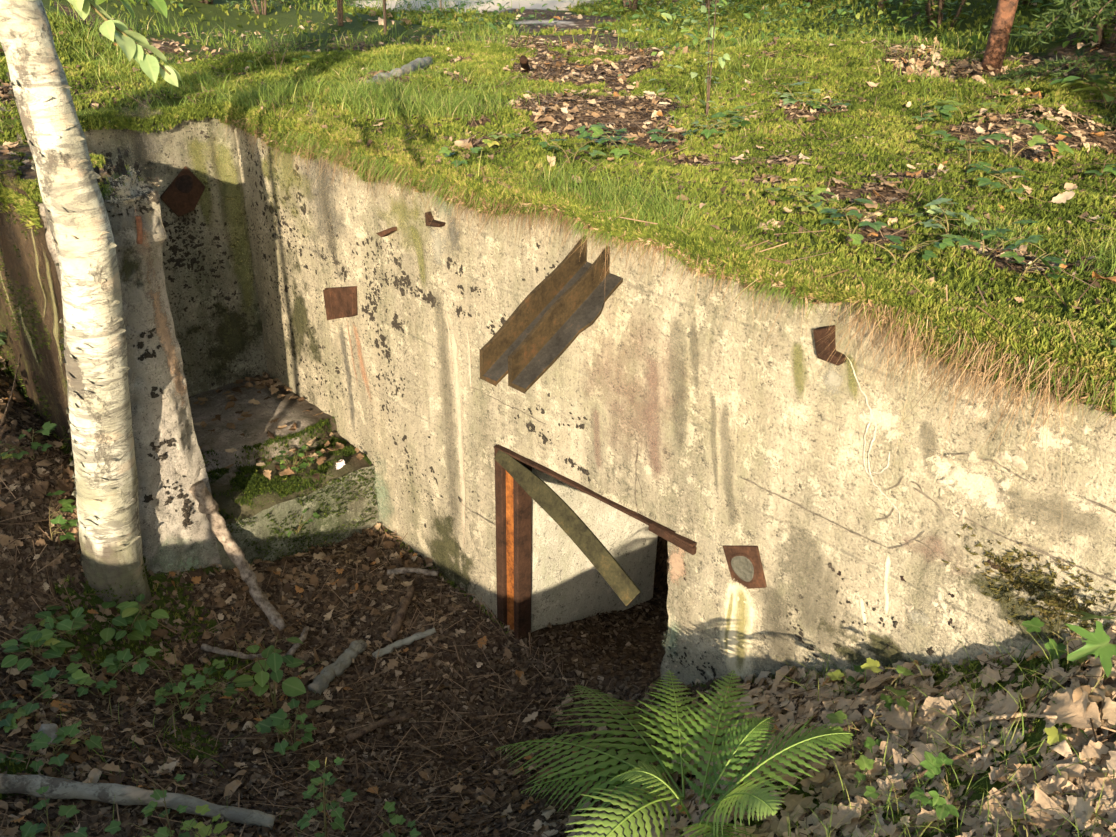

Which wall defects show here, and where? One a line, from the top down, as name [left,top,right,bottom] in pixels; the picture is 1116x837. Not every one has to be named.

damp [718,580,759,681]